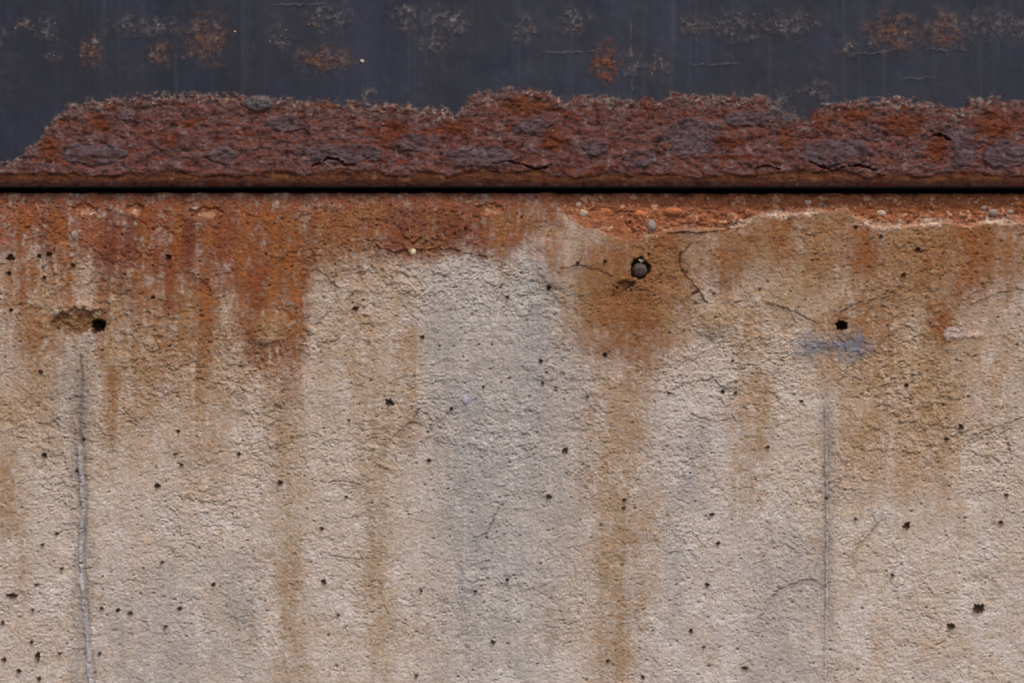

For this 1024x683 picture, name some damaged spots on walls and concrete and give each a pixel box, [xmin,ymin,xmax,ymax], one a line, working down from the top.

rust [0,193,563,364]
rust [578,230,683,349]
crack [668,227,740,303]
rust [703,209,1024,292]